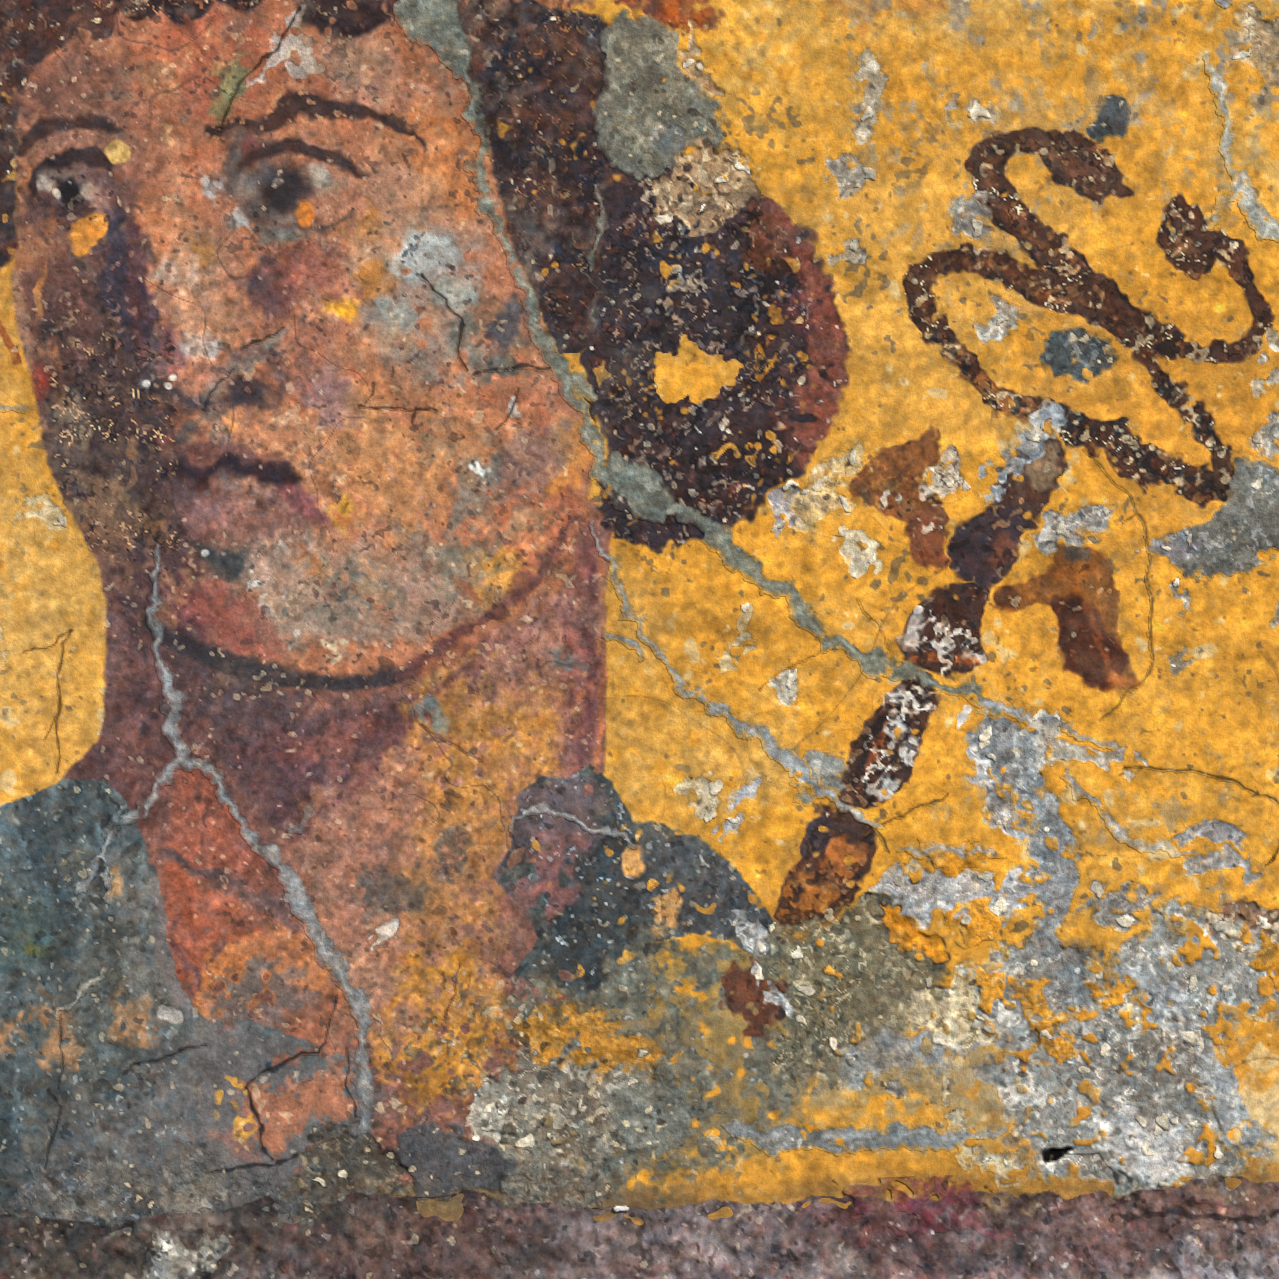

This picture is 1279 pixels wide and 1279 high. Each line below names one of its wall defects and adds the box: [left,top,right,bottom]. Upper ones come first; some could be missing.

flaking render [667,17,726,98]
crack [0,403,29,413]
crack [392,0,1279,866]
flaking render [1146,527,1204,618]
crack [23,628,75,775]
flaking render [766,668,800,707]
crack [74,542,383,1174]
flaking render [672,769,773,843]
flaking render [725,703,1279,1201]
crack [970,881,1059,901]
crack [44,967,107,1167]
flaking render [464,986,684,1210]